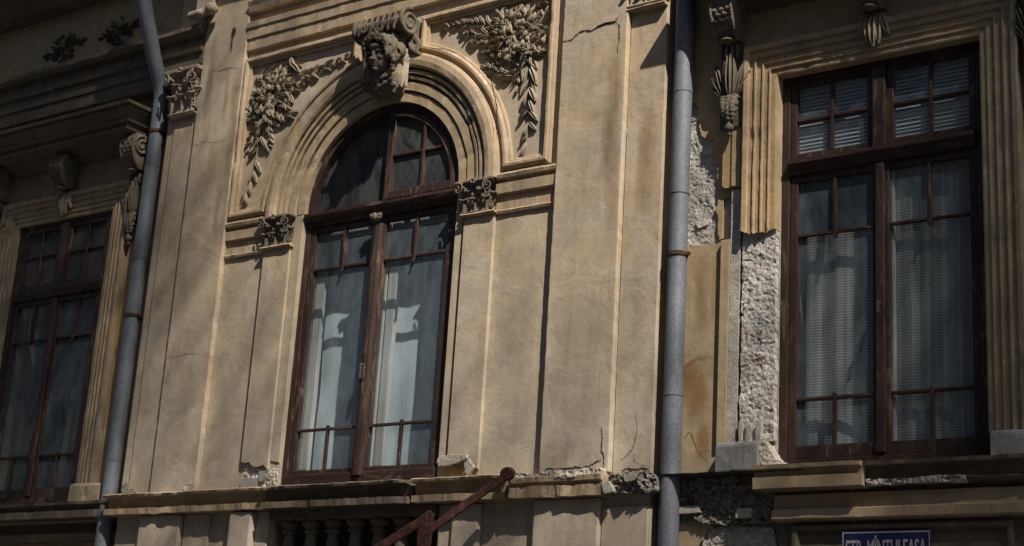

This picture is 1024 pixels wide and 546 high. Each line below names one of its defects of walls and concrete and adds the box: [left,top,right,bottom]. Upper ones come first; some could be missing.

crack [562,16,620,53]
flaking render [687,102,721,247]
flaking render [679,230,788,546]
crack [546,418,648,471]
flaking render [240,464,279,488]
flaking render [514,467,660,495]